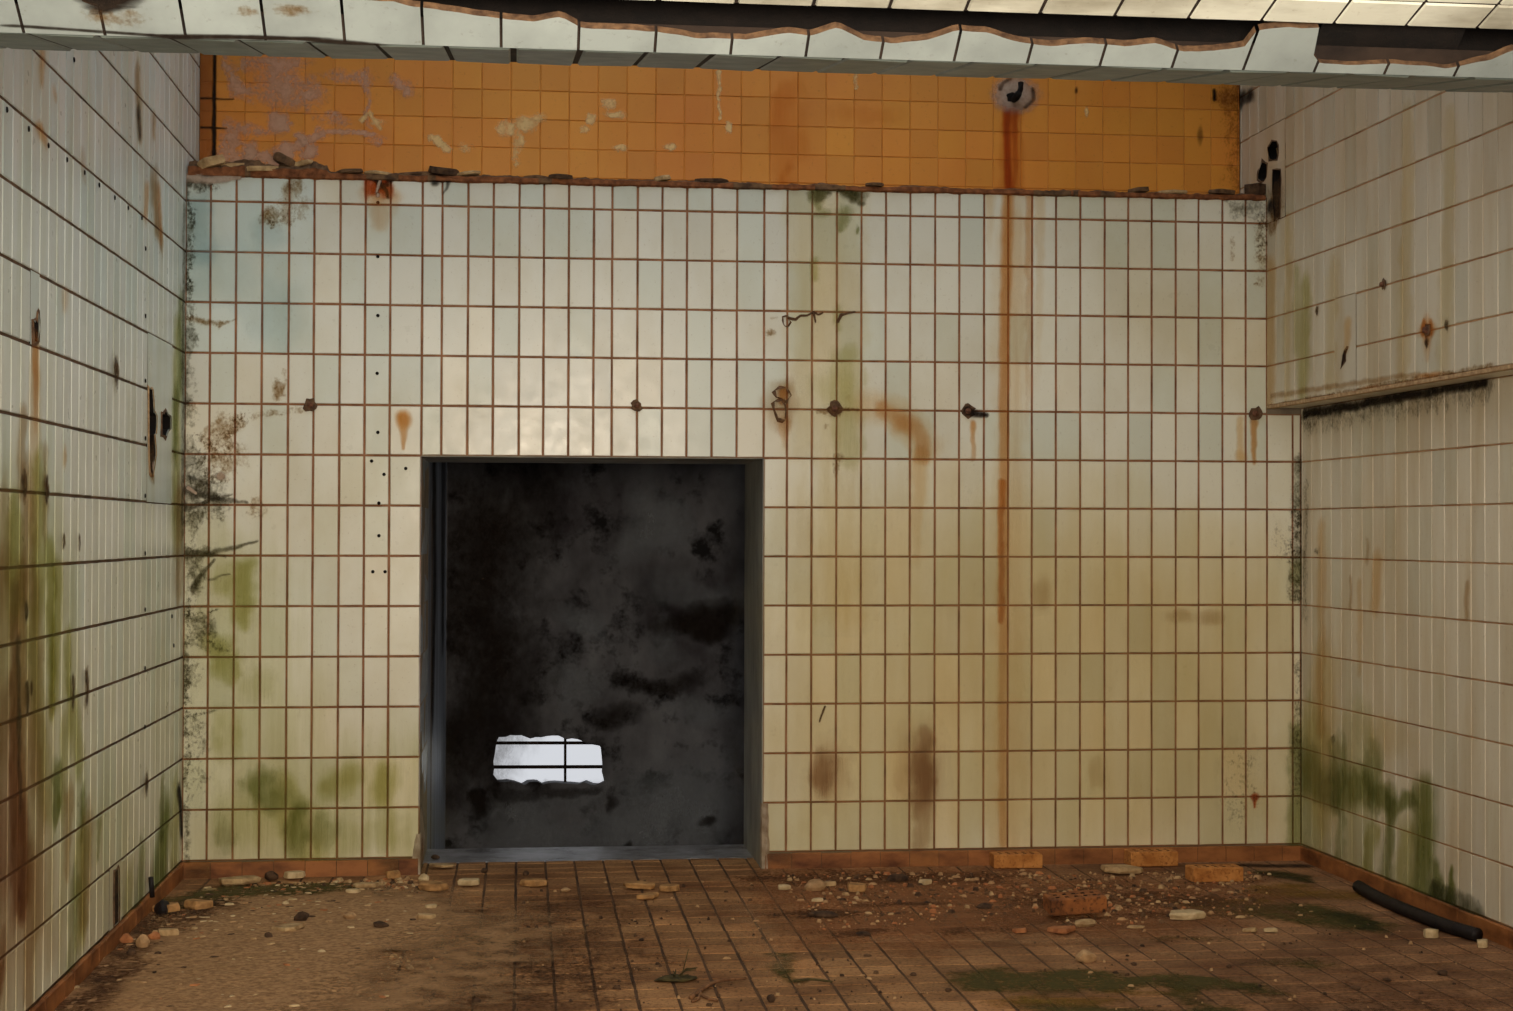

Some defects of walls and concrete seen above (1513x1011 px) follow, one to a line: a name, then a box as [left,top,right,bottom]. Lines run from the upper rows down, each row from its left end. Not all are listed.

spalling [188,55,1286,222]
rust [1003,107,1017,189]
spalling [146,386,172,477]
damp [181,182,258,786]
damp [1284,456,1318,605]
damp [1432,881,1483,917]